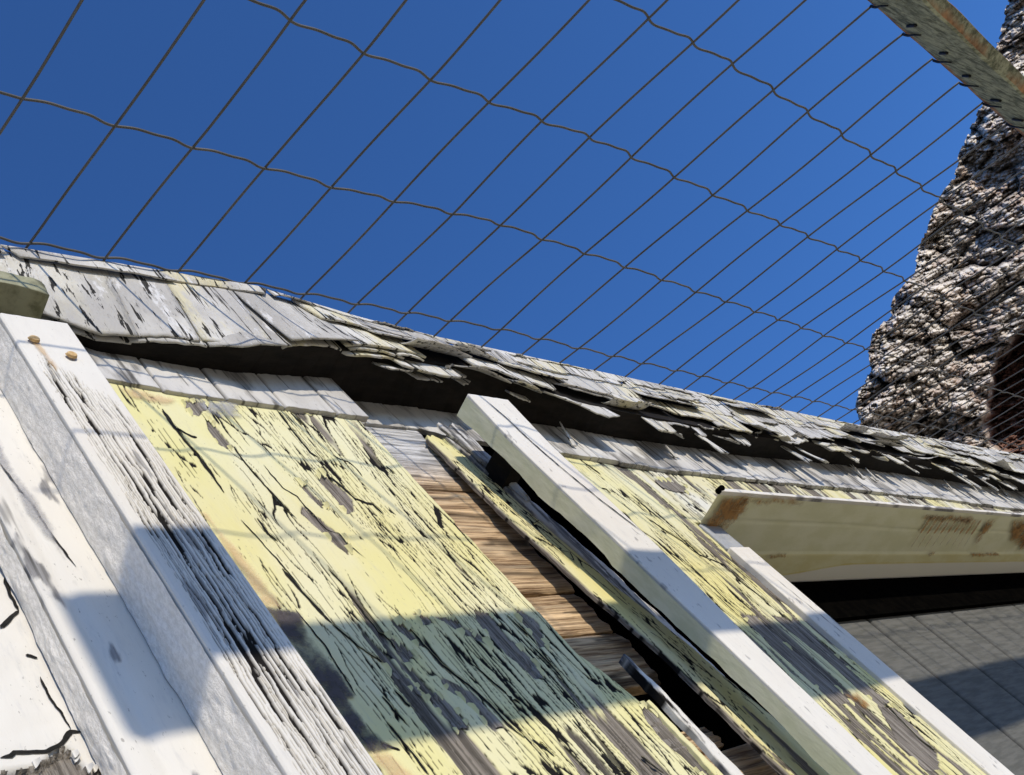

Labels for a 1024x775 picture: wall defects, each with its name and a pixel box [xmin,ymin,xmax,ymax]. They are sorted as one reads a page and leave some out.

peeling [180,398,233,451]
peeling [295,468,353,555]
corrosion [708,498,795,529]
corrosion [913,515,998,556]
corrosion [1011,522,1024,549]
crack [0,577,19,628]
spalling [517,476,769,774]
crack [0,654,81,758]
peeling [380,608,550,735]
peeling [740,613,944,775]